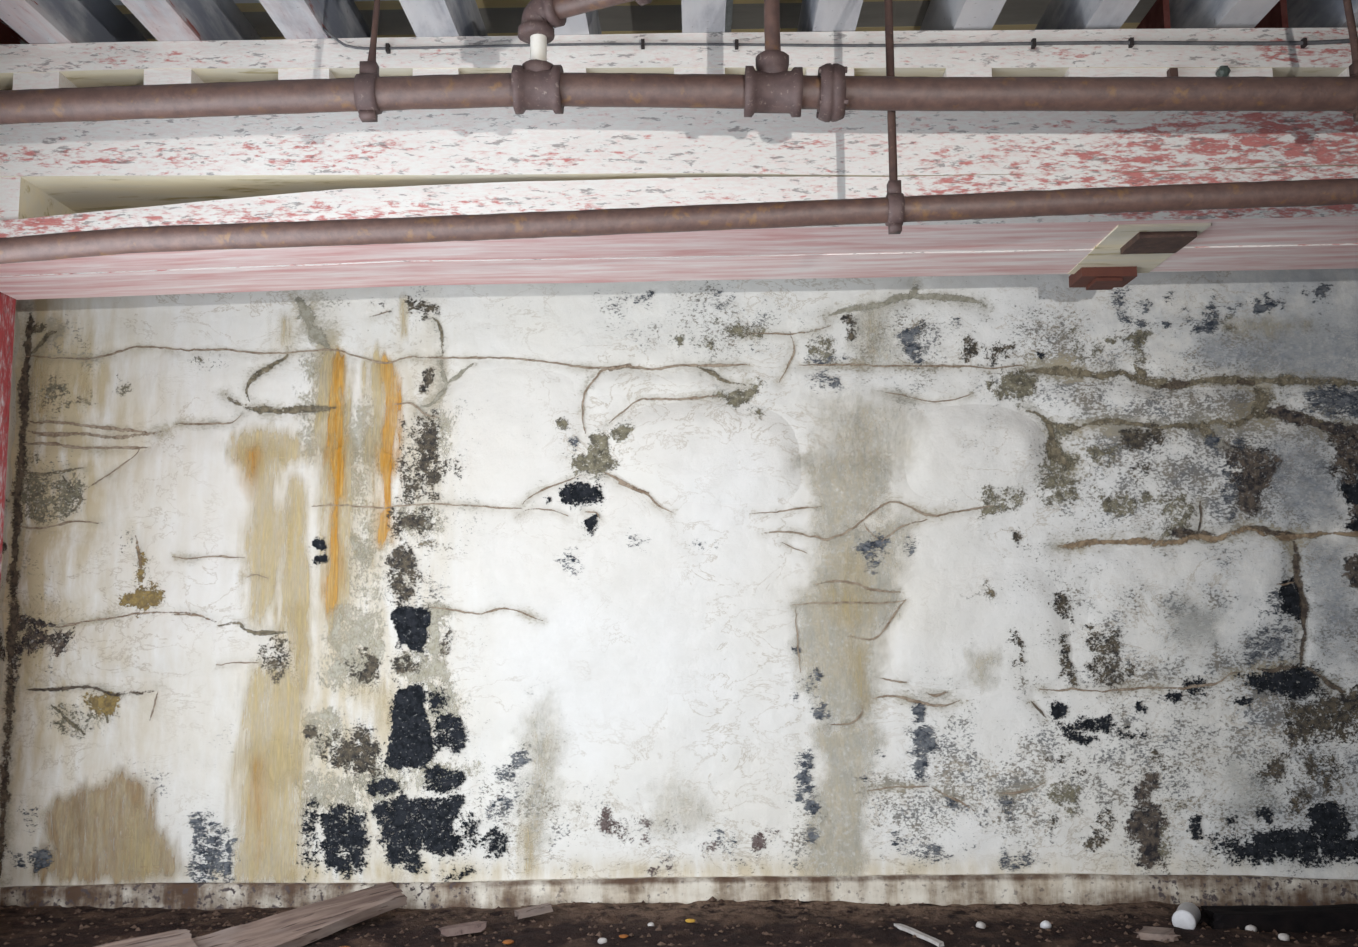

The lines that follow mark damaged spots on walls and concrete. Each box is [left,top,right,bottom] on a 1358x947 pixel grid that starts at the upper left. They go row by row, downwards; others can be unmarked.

mould [256,633,292,683]
rust [231,349,352,690]
rust [362,350,402,545]
damp [296,408,550,882]
damp [416,366,436,394]
crack [0,284,1358,878]
damp [790,418,916,876]
damp [804,313,1039,410]
damp [904,696,940,782]
damp [978,418,1166,519]
damp [1038,548,1358,875]
damp [1061,283,1358,531]